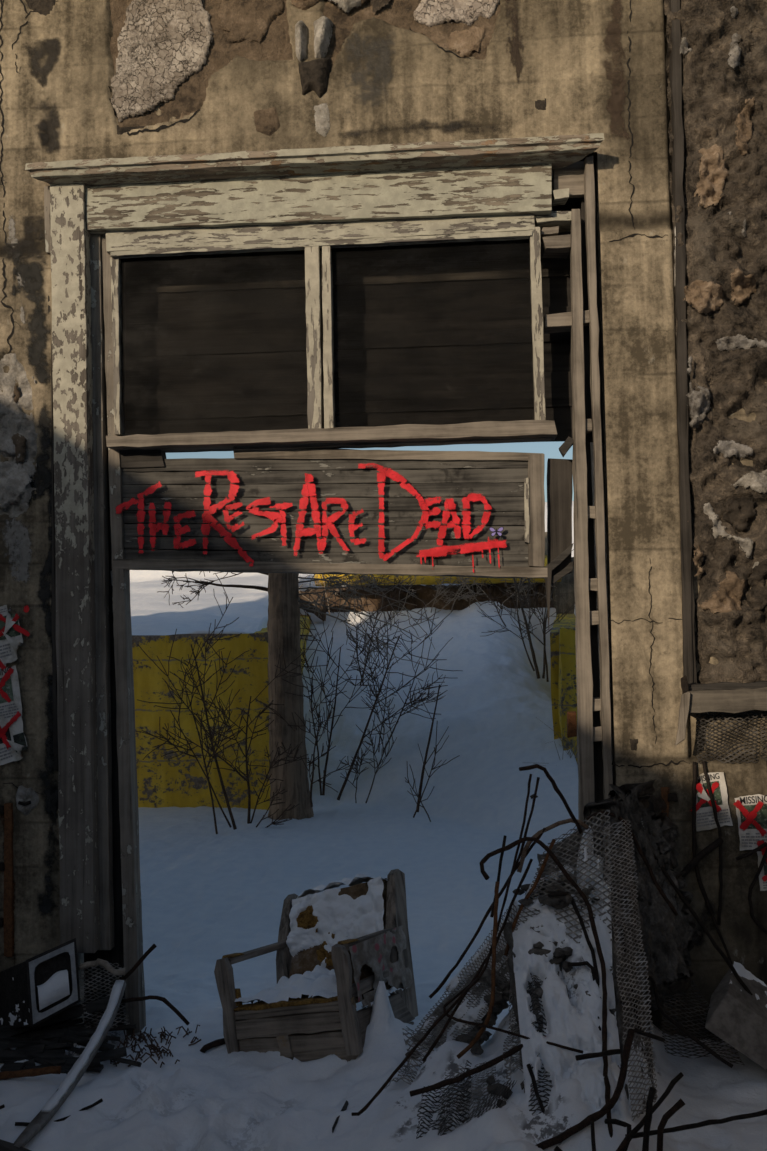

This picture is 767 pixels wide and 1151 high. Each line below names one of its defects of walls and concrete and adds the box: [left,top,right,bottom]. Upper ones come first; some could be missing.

crack [0,0,56,354]
flaking render [26,0,56,16]
flaking render [110,0,293,135]
flaking render [323,0,500,68]
crack [609,0,665,242]
flaking render [0,353,38,518]
crack [609,562,690,768]